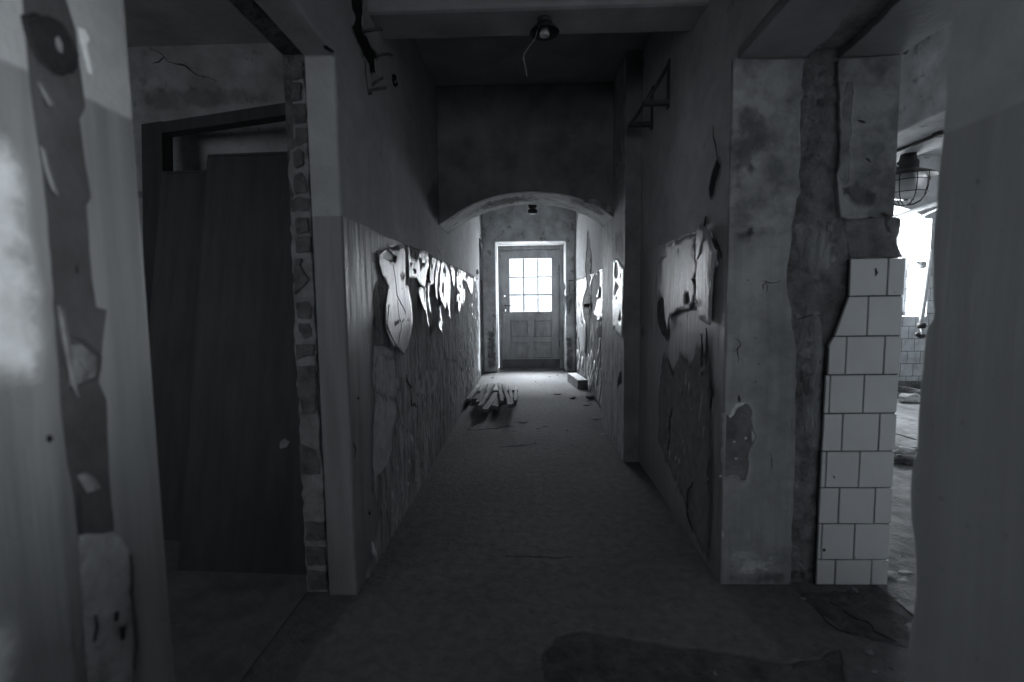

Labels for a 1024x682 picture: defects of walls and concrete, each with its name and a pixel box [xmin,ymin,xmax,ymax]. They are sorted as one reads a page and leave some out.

flaking render [78,27,93,75]
crack [151,48,217,81]
peeling [40,146,59,196]
spalling [843,216,902,276]
flaking render [563,229,624,409]
flaking render [657,297,670,341]
spalling [57,305,97,397]
flaking render [364,243,479,580]
flaking render [719,395,759,484]